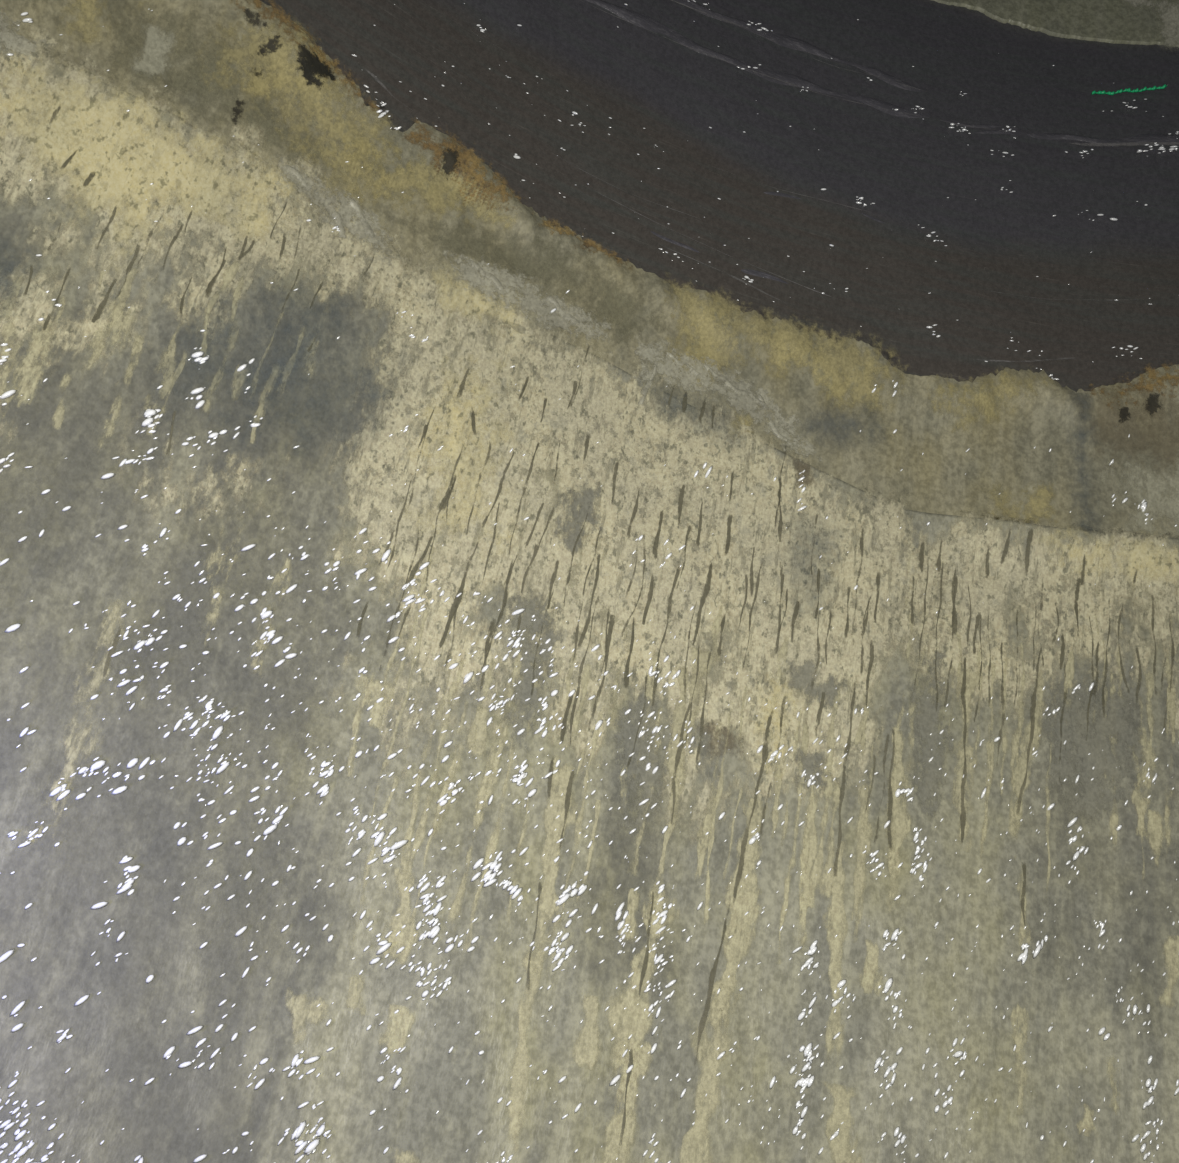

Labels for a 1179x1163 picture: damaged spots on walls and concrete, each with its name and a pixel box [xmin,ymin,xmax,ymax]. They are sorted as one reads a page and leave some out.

spalling [245,8,267,26]
spalling [258,35,282,56]
corrosion [236,0,379,109]
spalling [297,44,336,87]
spalling [443,149,460,180]
corrosion [406,122,521,210]
peeling [444,251,611,340]
leakage [672,284,898,412]
leakage [138,326,251,518]
leakage [883,708,911,909]
leakage [573,885,679,1163]
leakage [826,1085,861,1163]